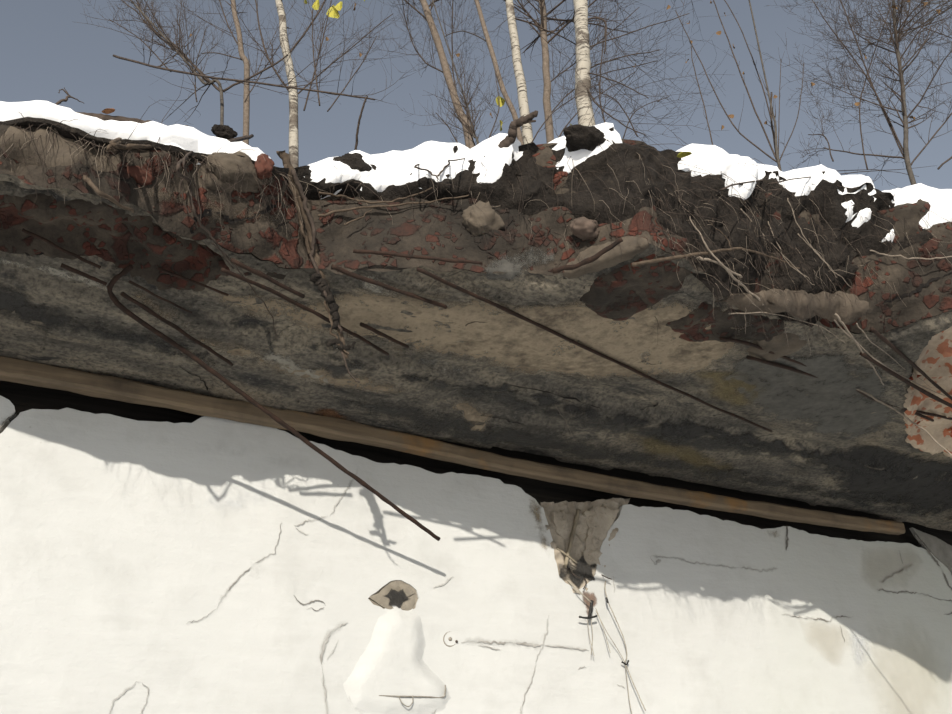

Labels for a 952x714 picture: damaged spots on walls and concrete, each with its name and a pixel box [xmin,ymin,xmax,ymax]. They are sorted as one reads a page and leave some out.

spalling [0,124,709,321]
leakage [38,266,104,289]
spalling [666,199,952,361]
leakage [199,276,912,509]
spalling [903,327,952,458]
crack [192,474,357,622]
spalling [368,580,418,611]
spalling [541,498,630,594]
crack [650,526,789,572]
crack [878,533,952,615]
crack [320,622,348,714]
crack [461,615,589,714]